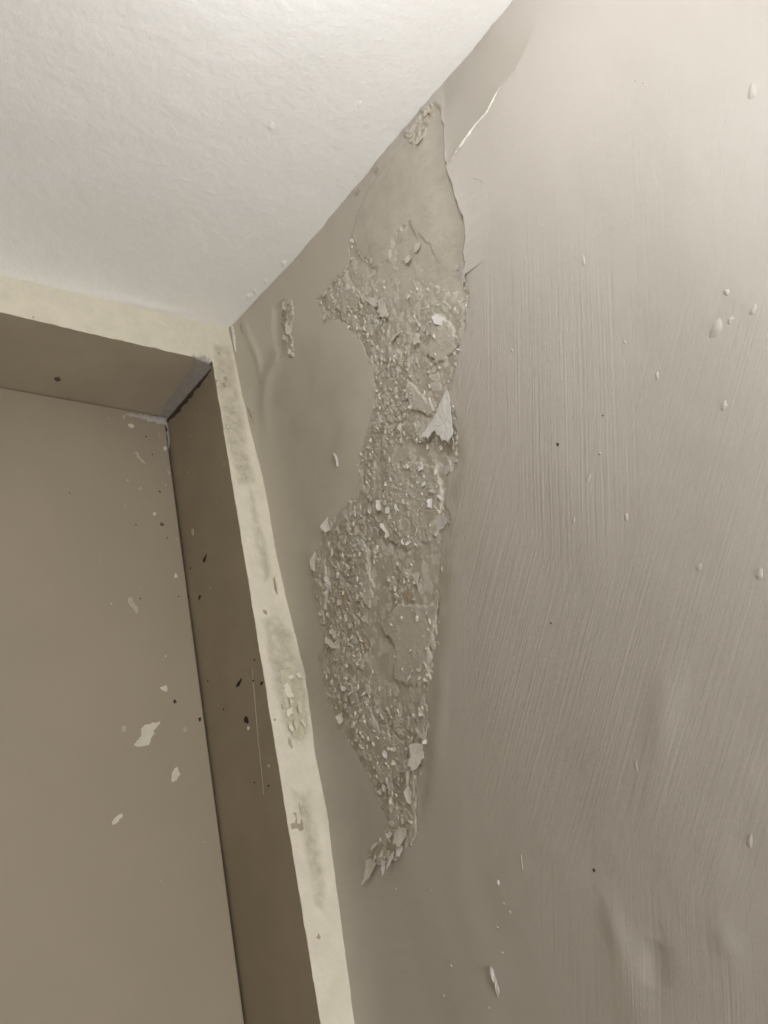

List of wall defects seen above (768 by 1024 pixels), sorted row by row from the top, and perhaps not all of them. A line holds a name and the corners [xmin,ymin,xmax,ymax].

peeling [281,298,295,358]
peeling [310,93,493,885]